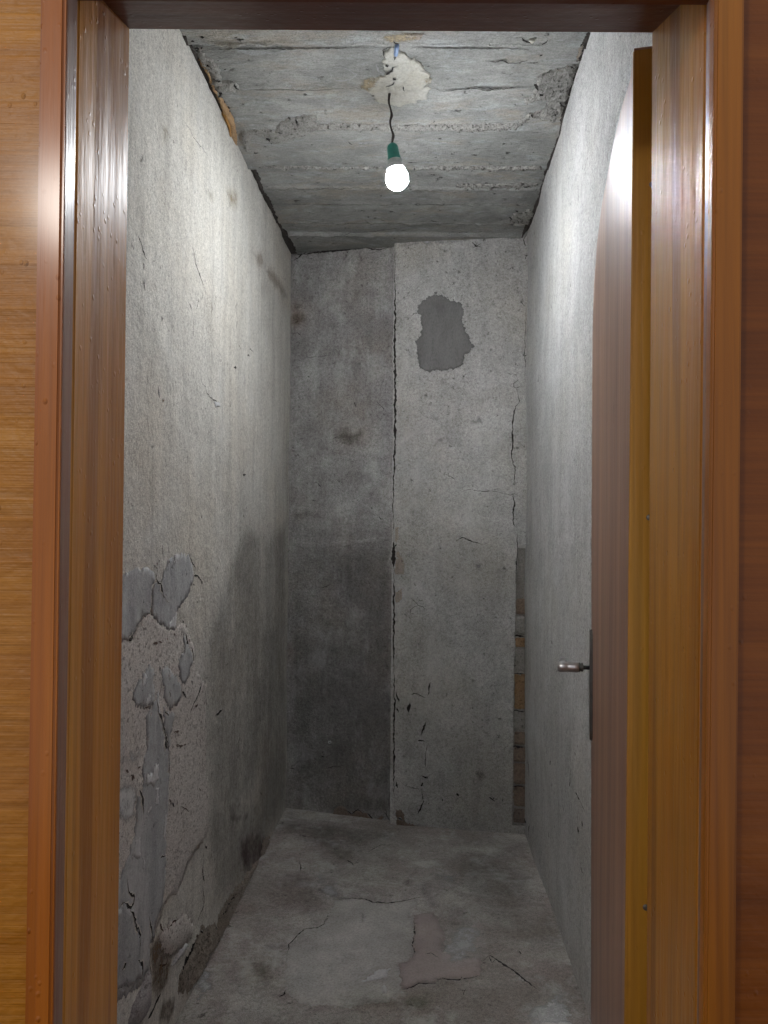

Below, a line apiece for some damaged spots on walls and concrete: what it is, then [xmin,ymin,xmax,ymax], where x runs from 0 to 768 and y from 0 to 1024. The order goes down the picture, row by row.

crack [293,225,429,813]
flaking render [411,292,475,373]
crack [446,301,526,583]
flaking render [117,612,209,989]
crack [486,951,540,991]